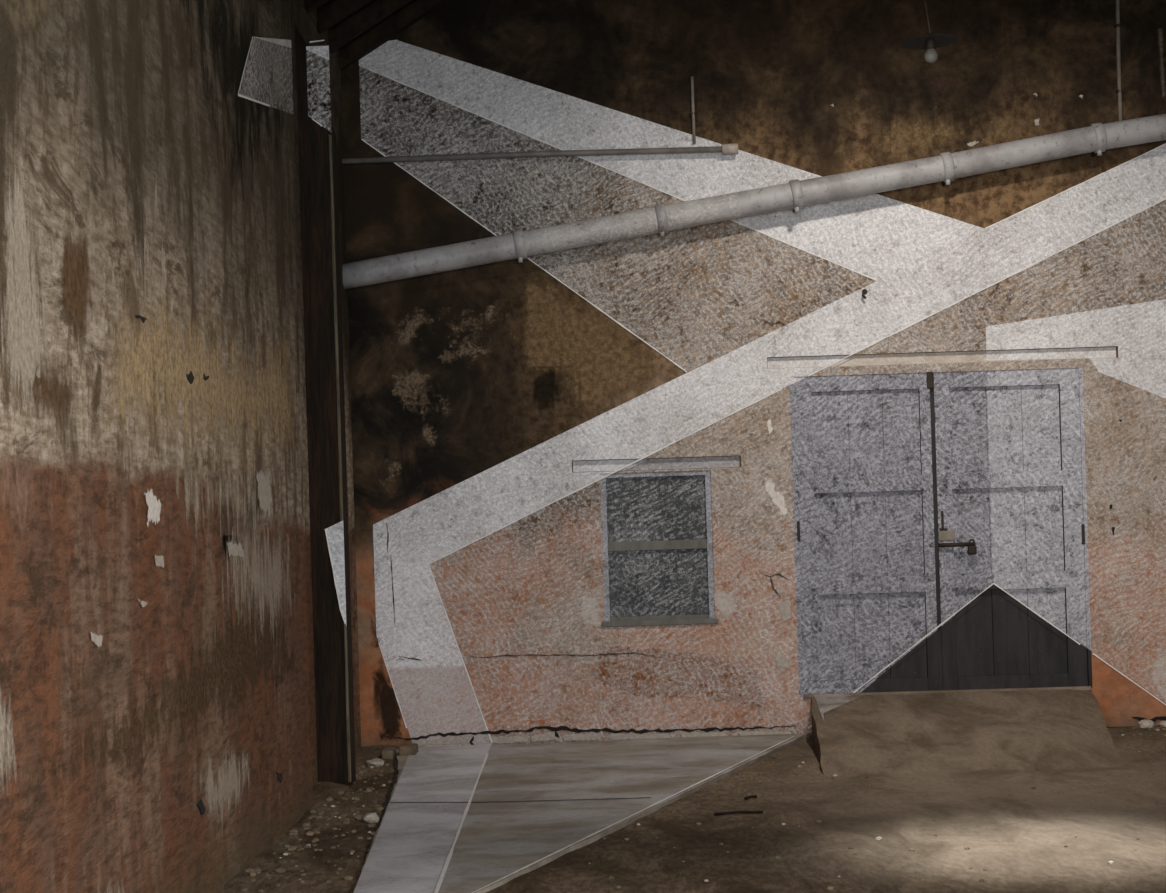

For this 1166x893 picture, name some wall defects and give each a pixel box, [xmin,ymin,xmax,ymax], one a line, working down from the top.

crack [379,725,798,823]